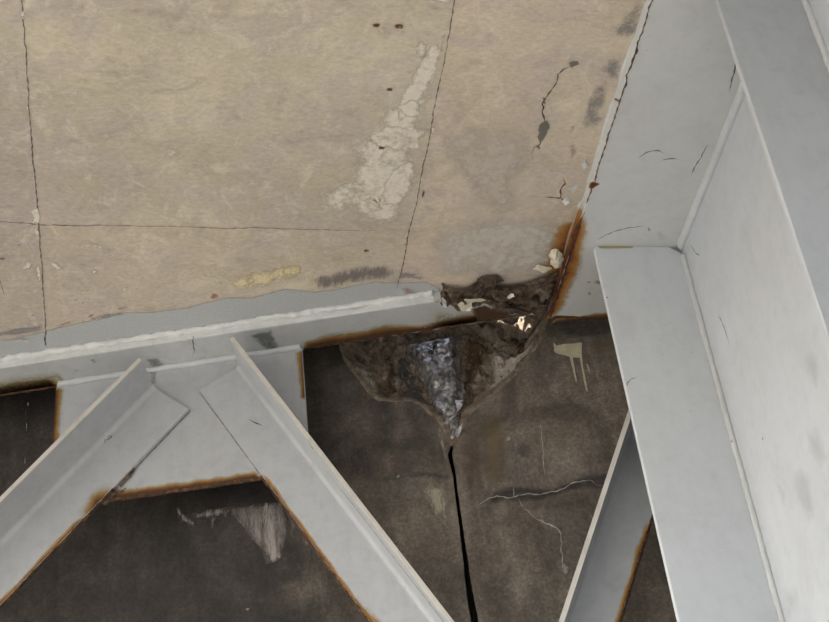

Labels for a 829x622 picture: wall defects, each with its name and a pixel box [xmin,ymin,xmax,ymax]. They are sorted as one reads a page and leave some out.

crack [531,61,579,160]
corrosion [297,0,653,399]
crack [548,179,569,206]
spalling [339,305,549,446]
corrosion [0,473,378,622]
damp [178,502,295,563]
crack [448,418,603,622]